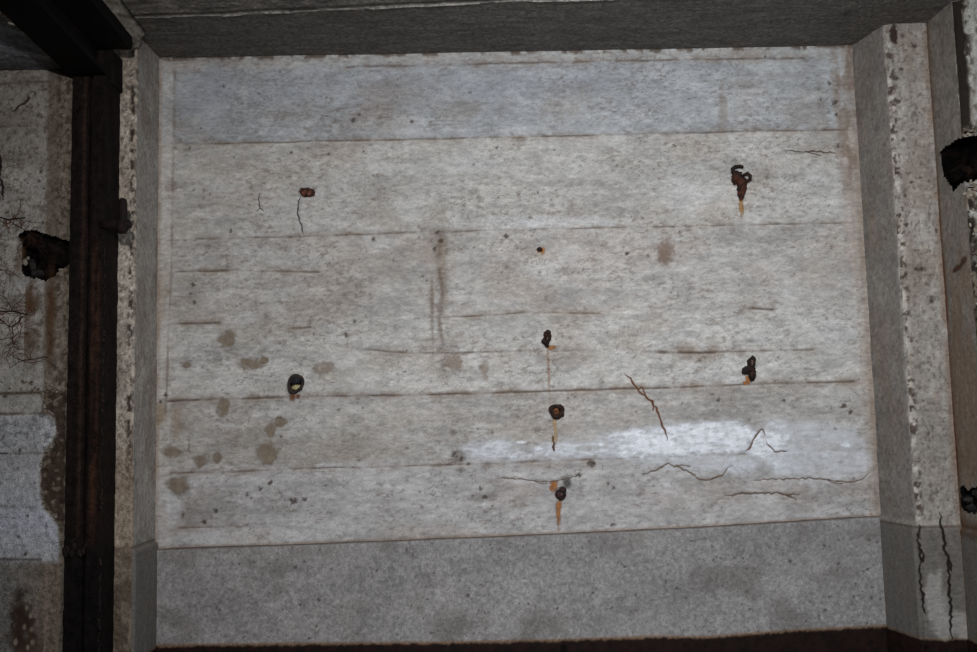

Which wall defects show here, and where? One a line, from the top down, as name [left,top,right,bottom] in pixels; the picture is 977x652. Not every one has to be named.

crack [0,155,8,200]
spalling [940,126,977,305]
hole [18,230,70,281]
crack [625,374,668,439]
efflorescence [463,421,798,473]
crack [646,428,870,500]
corrosion [550,482,561,525]
spalling [960,485,977,514]
crack [916,511,953,639]